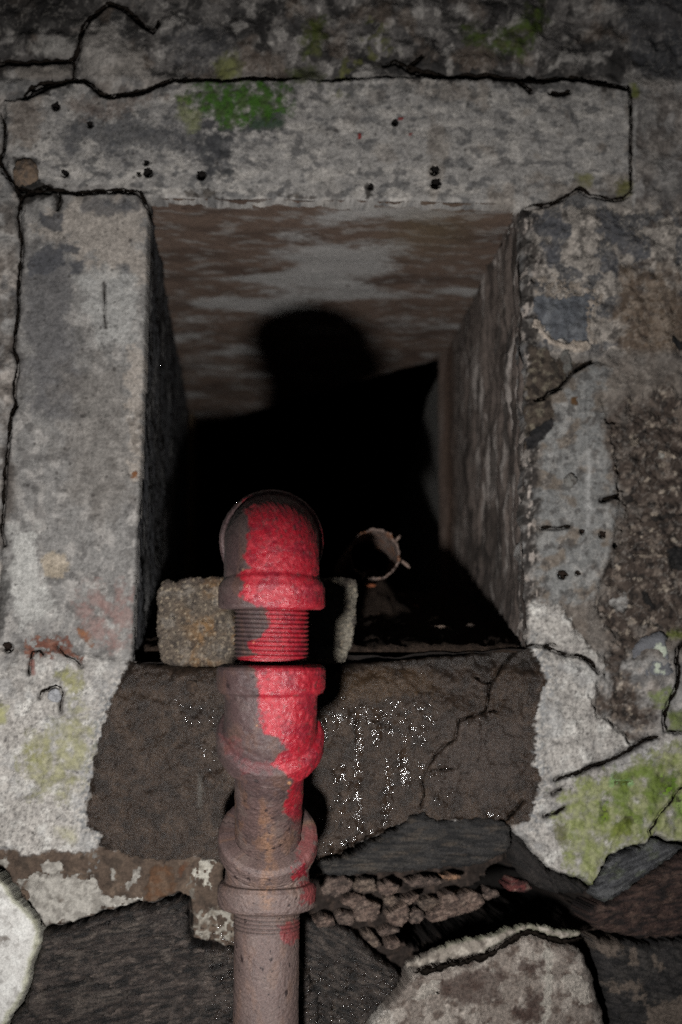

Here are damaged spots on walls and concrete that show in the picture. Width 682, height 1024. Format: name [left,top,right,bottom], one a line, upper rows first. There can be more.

crack [0,1,285,99]
crack [385,55,633,209]
crack [0,114,154,545]
crack [536,361,592,400]
crack [541,523,570,531]
crack [601,494,619,502]
corrosion [25,629,89,674]
crack [420,643,598,807]
crack [505,643,682,821]